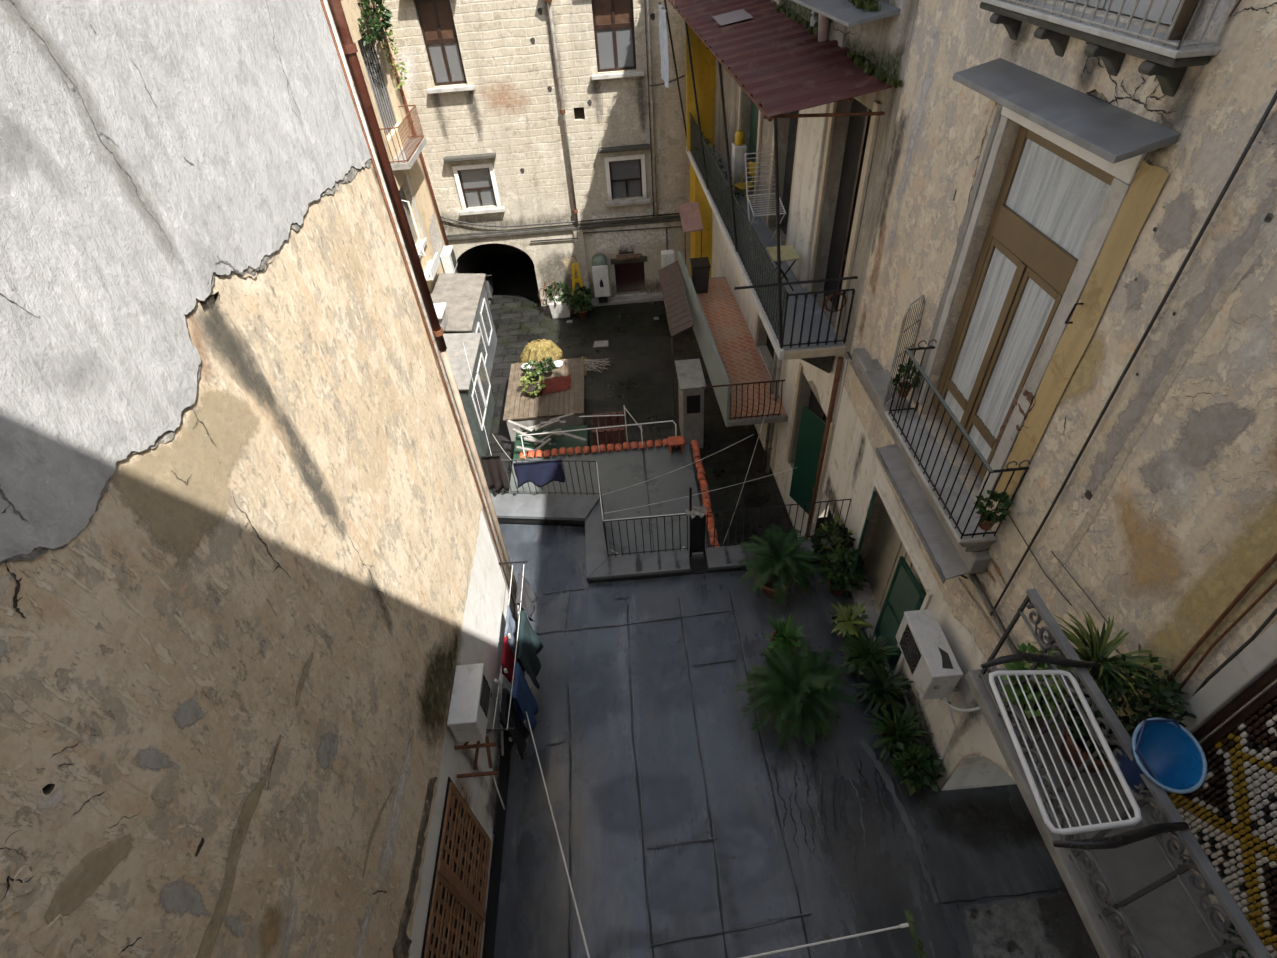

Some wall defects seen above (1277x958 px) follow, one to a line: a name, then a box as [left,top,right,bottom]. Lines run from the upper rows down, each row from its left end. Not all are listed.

crack [1233,2,1277,16]
crack [1083,42,1169,123]
spalling [282,158,372,244]
flaking render [184,255,270,337]
leakage [201,303,338,525]
crack [0,484,29,522]
flaking render [0,363,258,566]
crack [3,548,49,619]
crack [0,830,34,900]
flaking render [393,777,437,958]